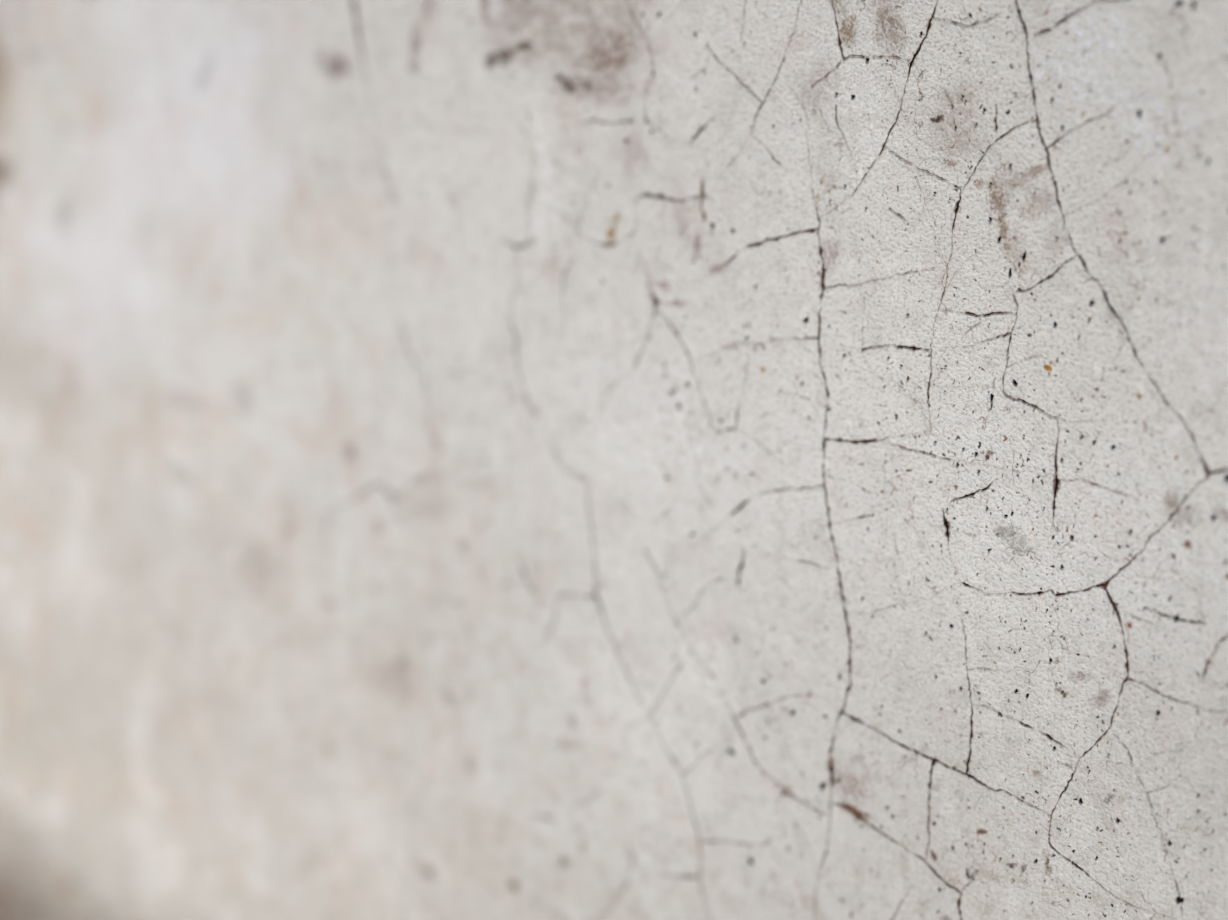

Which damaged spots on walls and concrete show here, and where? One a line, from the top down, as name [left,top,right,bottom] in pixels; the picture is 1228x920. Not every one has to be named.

crack [563,213,739,430]
crack [627,0,1228,920]